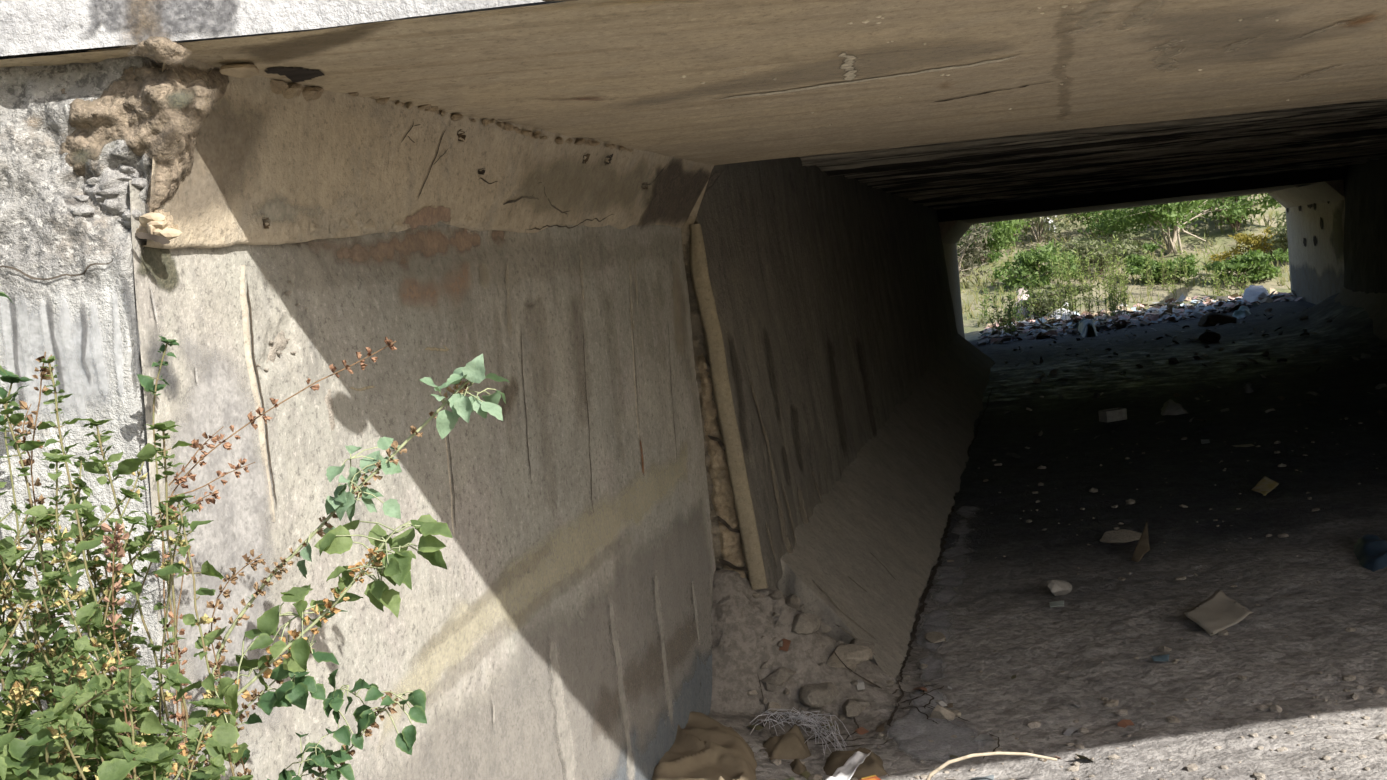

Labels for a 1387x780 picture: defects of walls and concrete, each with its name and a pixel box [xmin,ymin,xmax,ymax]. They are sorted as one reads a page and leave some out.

spalling [70,164,182,244]
crack [479,177,614,230]
crack [0,257,116,280]
leakage [0,279,141,417]